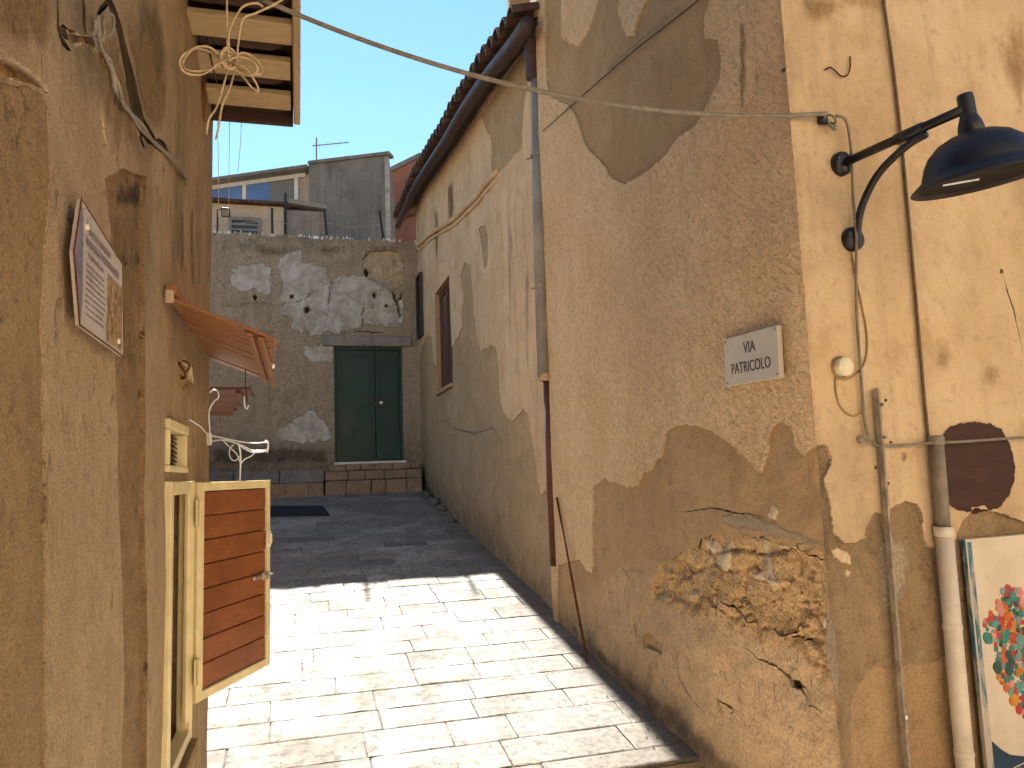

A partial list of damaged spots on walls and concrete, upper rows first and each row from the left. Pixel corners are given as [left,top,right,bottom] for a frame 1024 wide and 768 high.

flaking render [481,53,528,172]
flaking render [545,0,721,184]
peeling [230,250,404,363]
flaking render [479,225,488,269]
peeling [276,410,332,444]
flaking render [419,262,955,768]
crack [681,507,762,517]
crack [705,575,817,706]
flaking render [954,508,1024,768]